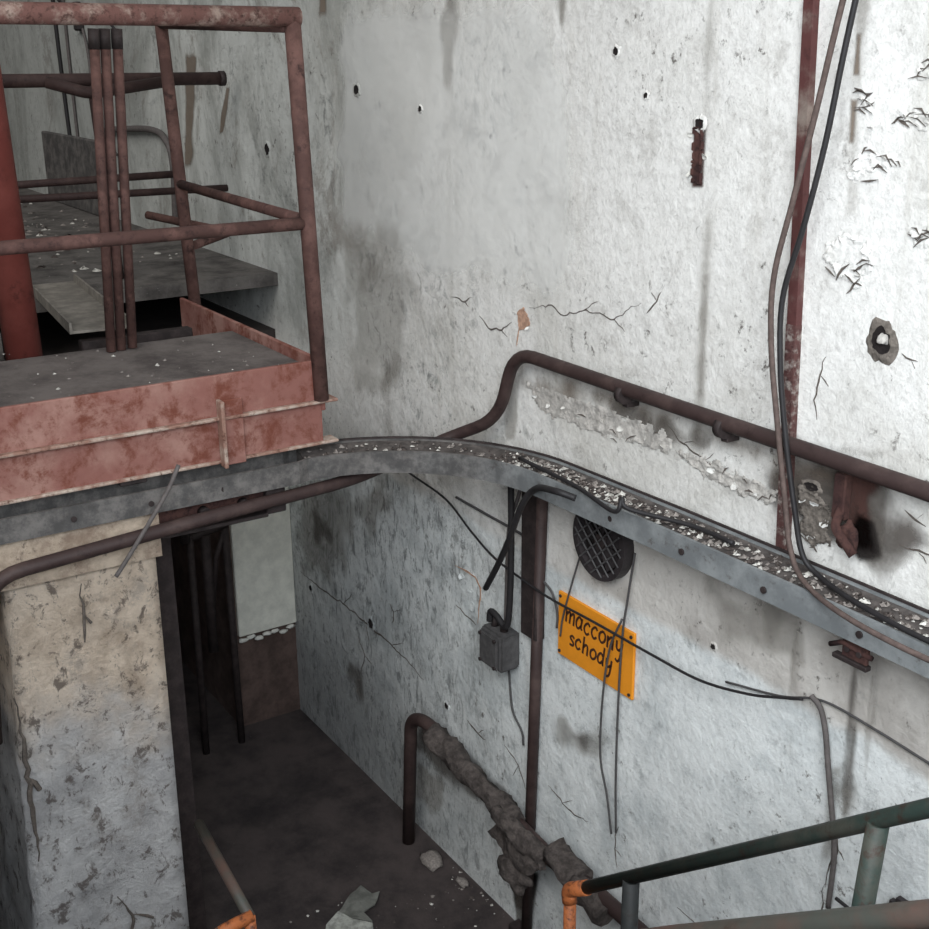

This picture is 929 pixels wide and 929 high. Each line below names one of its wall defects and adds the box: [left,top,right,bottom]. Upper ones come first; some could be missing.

spalling [908,56,929,81]
spalling [853,88,880,115]
spalling [892,108,929,131]
spalling [847,147,901,183]
spalling [907,223,929,248]
spalling [823,232,875,294]
crack [455,297,510,335]
crack [530,292,661,332]
spalling [526,381,778,506]
spalling [797,479,832,552]
crack [13,698,42,862]